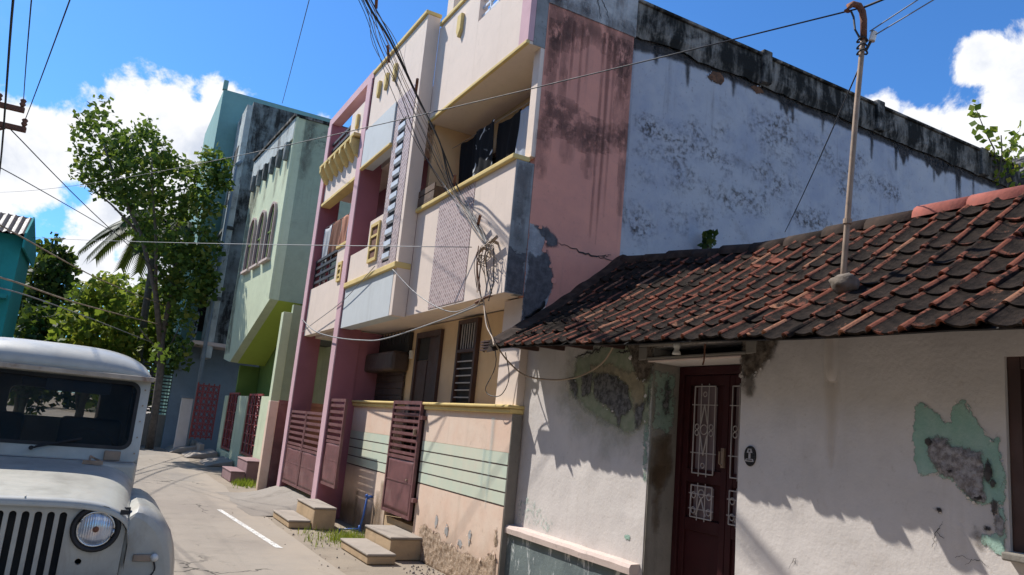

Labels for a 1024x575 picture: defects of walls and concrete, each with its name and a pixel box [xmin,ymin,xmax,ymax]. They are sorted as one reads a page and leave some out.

damp [633,36,1007,198]
peeling [521,223,558,321]
crack [563,244,613,261]
peeling [568,345,667,481]
damp [650,438,672,502]
peeling [912,399,1007,555]
flaking render [418,515,498,575]